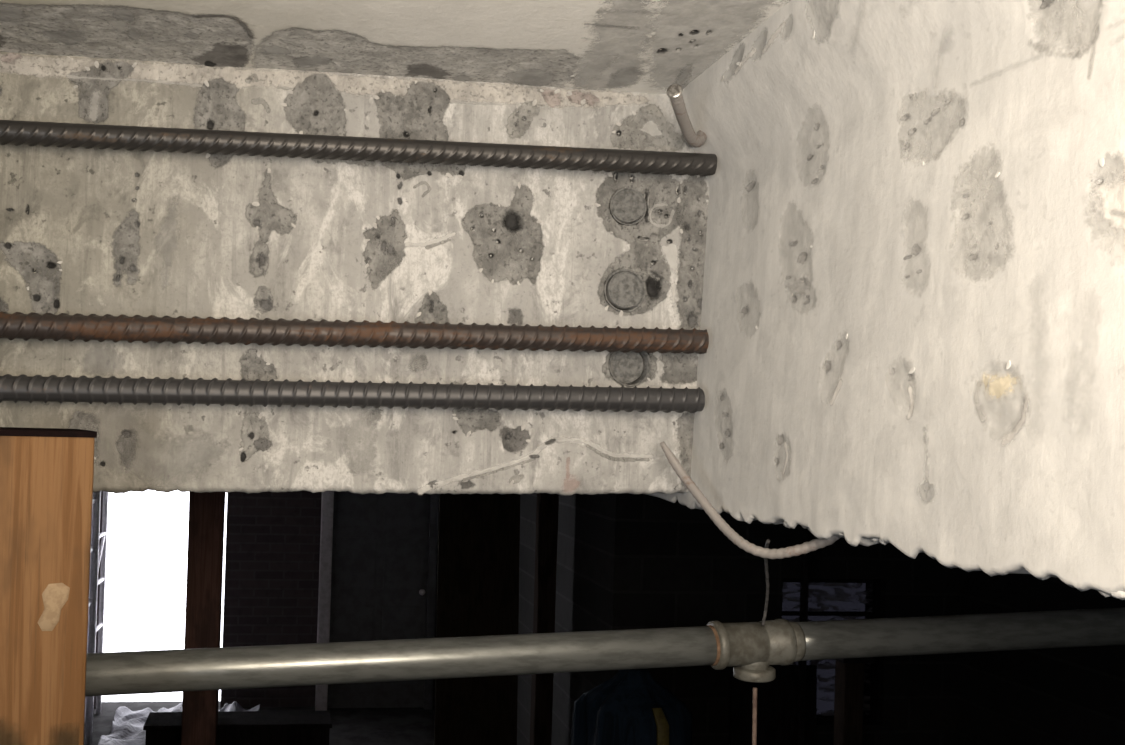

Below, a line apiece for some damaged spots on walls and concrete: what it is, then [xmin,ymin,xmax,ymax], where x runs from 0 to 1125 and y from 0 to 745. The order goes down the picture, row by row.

damp [608,67,641,88]
spalling [1095,157,1125,229]
spalling [0,0,844,559]
spalling [1098,591,1125,600]